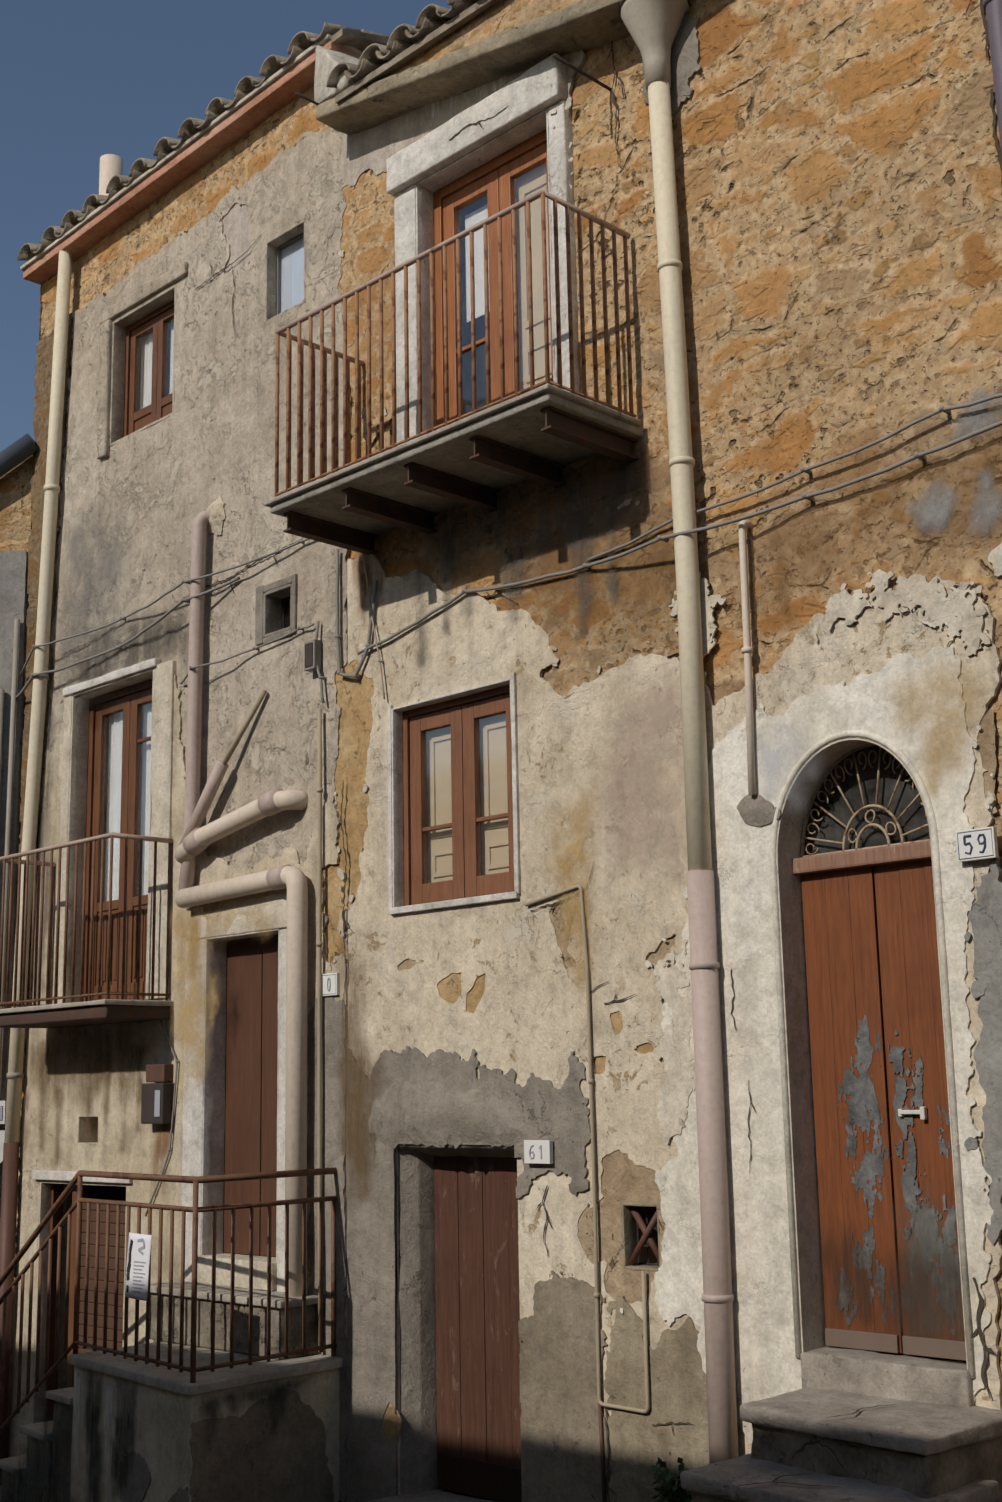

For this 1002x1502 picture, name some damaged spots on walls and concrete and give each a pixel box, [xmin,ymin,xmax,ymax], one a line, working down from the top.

crack [980,0,1002,196]
flaking render [338,169,397,444]
flaking render [491,488,679,699]
peeling [699,572,727,677]
peeling [813,569,992,656]
flaking render [438,973,486,1013]
peeling [633,934,695,1145]
flaking render [578,1150,666,1314]
peeling [833,1015,964,1336]
crack [972,1277,996,1398]
damp [0,1372,136,1502]
flaking render [167,1389,334,1502]